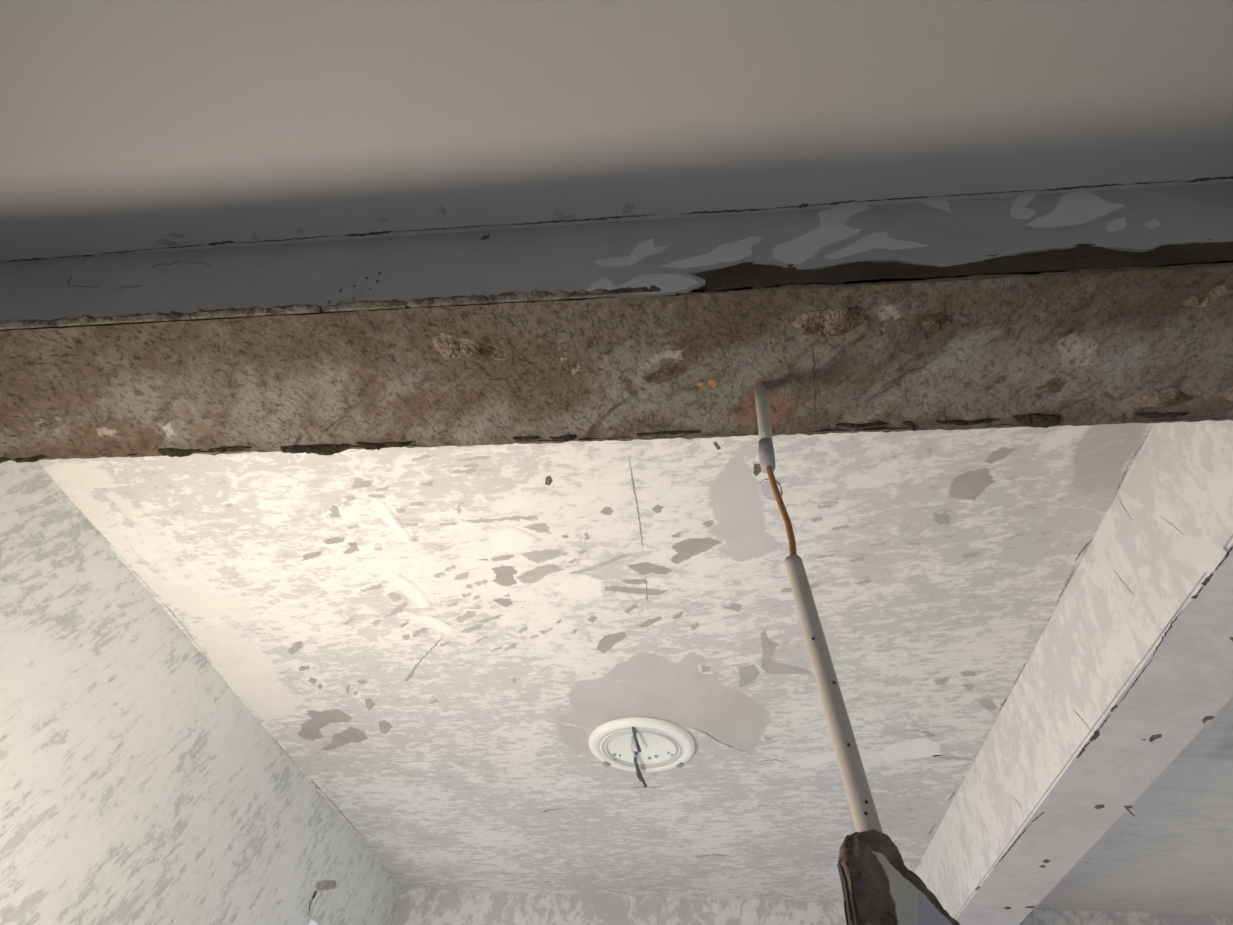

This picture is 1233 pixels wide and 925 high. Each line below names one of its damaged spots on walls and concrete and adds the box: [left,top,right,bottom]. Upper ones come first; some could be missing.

flaking render [0,191,1233,333]
spalling [792,306,869,338]
spalling [279,441,438,463]
peeling [751,463,763,478]
peeling [299,453,726,655]
peeling [736,627,815,689]